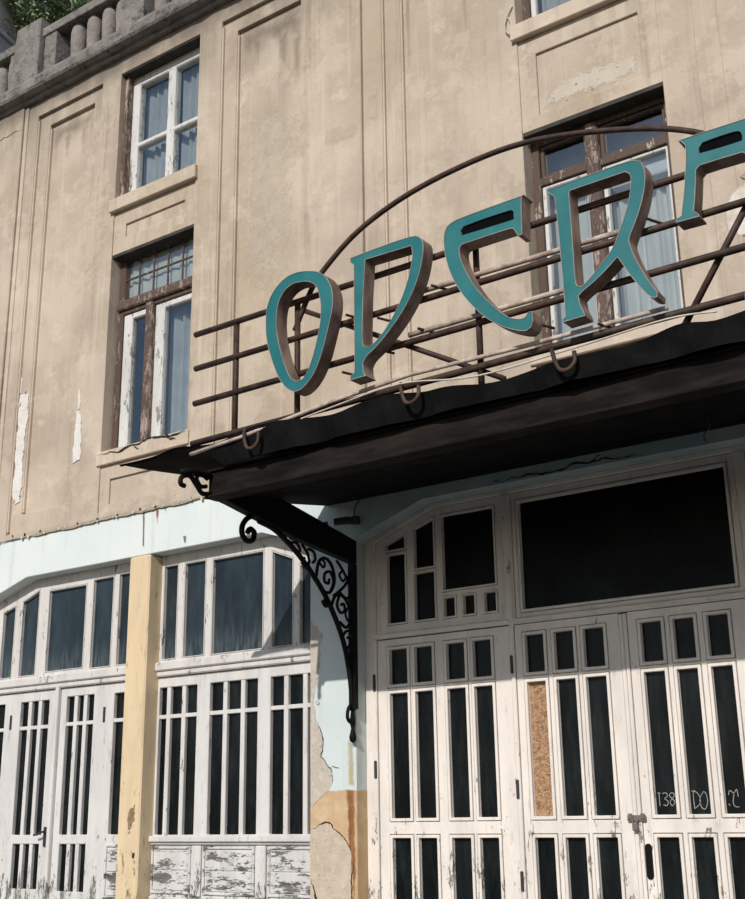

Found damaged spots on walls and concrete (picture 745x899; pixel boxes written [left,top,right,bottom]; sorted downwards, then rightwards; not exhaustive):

peeling [545,52,637,107]
peeling [725,171,745,235]
spalling [12,368,29,504]
spalling [72,390,82,464]
crack [494,454,636,482]
peeling [310,622,333,806]
peeling [310,821,354,899]